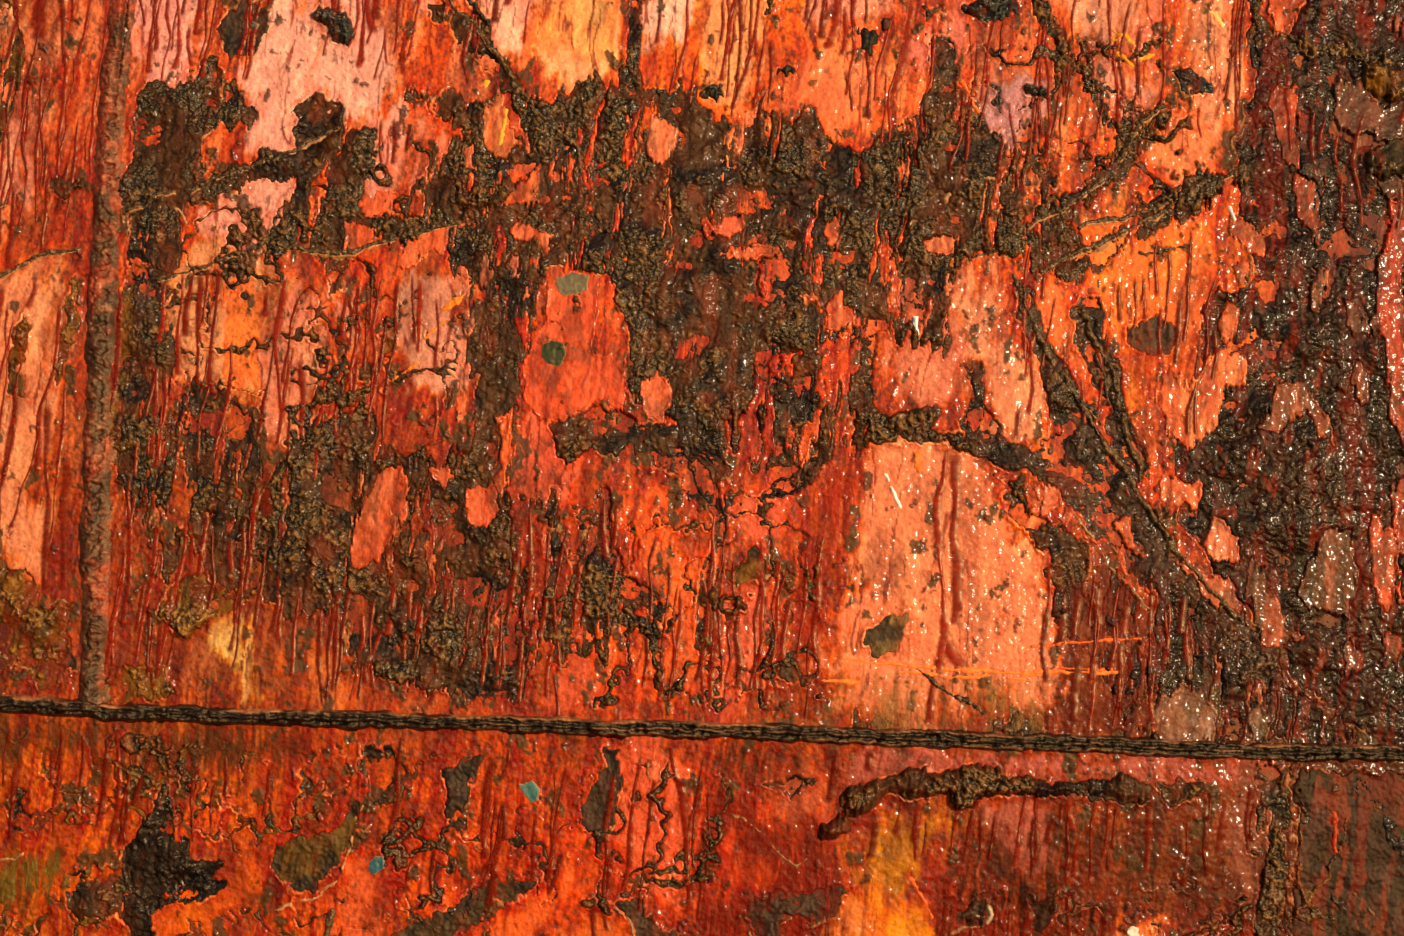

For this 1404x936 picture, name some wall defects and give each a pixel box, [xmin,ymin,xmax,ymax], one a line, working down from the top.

rust [0,0,106,268]
rust [103,0,1404,758]
rust [0,276,80,690]
peeling [275,805,364,911]
peeling [368,856,385,874]
peeling [519,780,540,802]
peeling [646,761,662,784]
rust [0,730,1404,936]
peeling [613,906,636,934]
peeling [949,925,985,936]